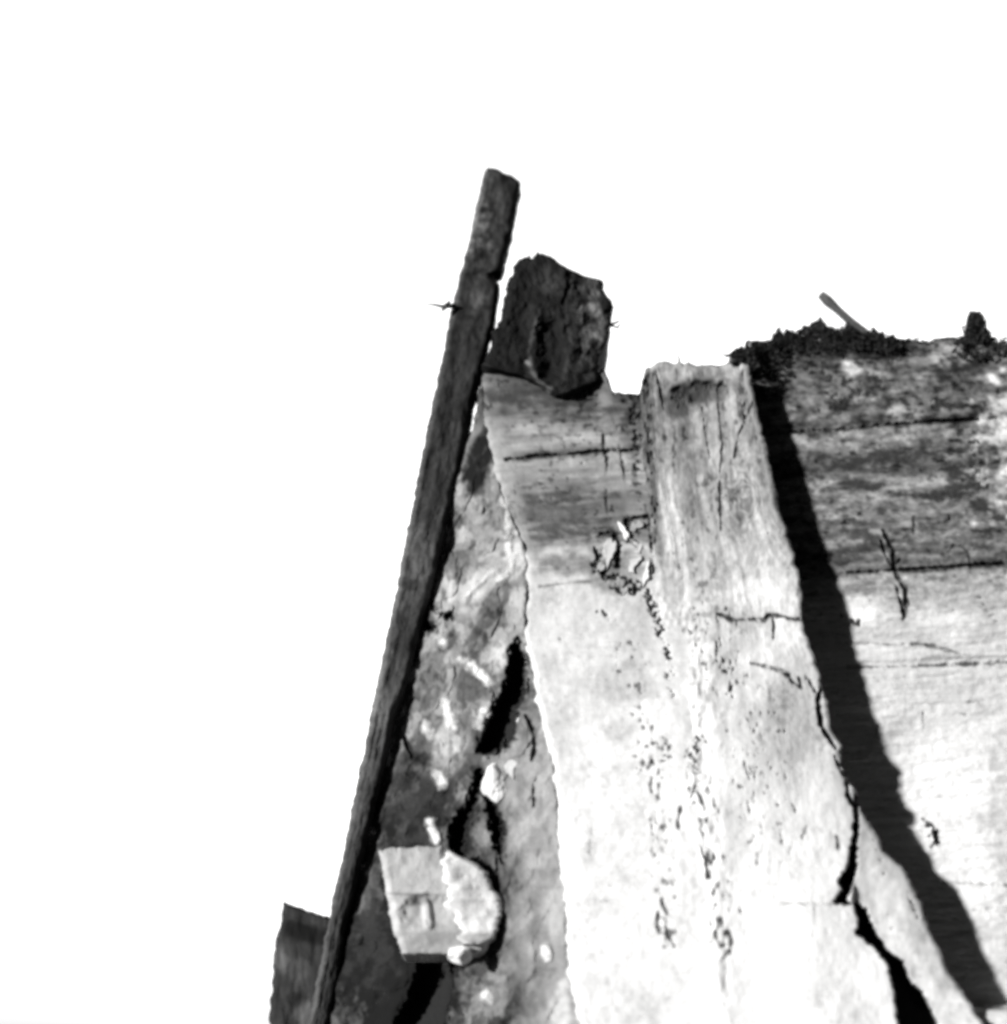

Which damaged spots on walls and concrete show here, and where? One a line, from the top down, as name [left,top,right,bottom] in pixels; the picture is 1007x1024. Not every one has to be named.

crack [505,435,628,472]
spalling [591,497,672,678]
crack [719,614,800,632]
crack [847,515,1005,620]
crack [524,715,535,742]
spalling [629,683,673,843]
crack [750,662,937,1024]